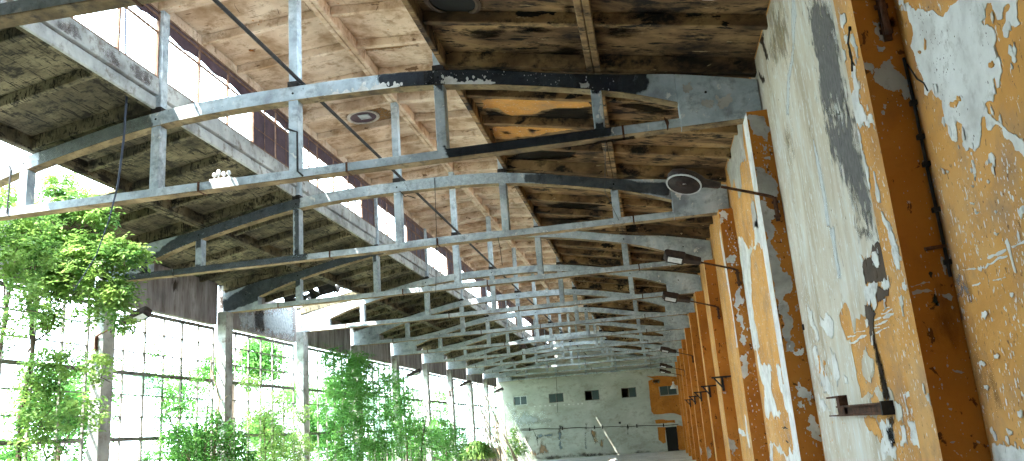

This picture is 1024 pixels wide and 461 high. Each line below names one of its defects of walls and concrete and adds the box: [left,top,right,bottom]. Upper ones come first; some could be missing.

leakage [470,29,504,39]
leakage [607,28,638,38]
peeling [441,75,496,84]
peeling [898,0,1024,188]
leakage [770,0,879,240]
peeling [719,0,920,461]
peeling [992,428,1024,461]